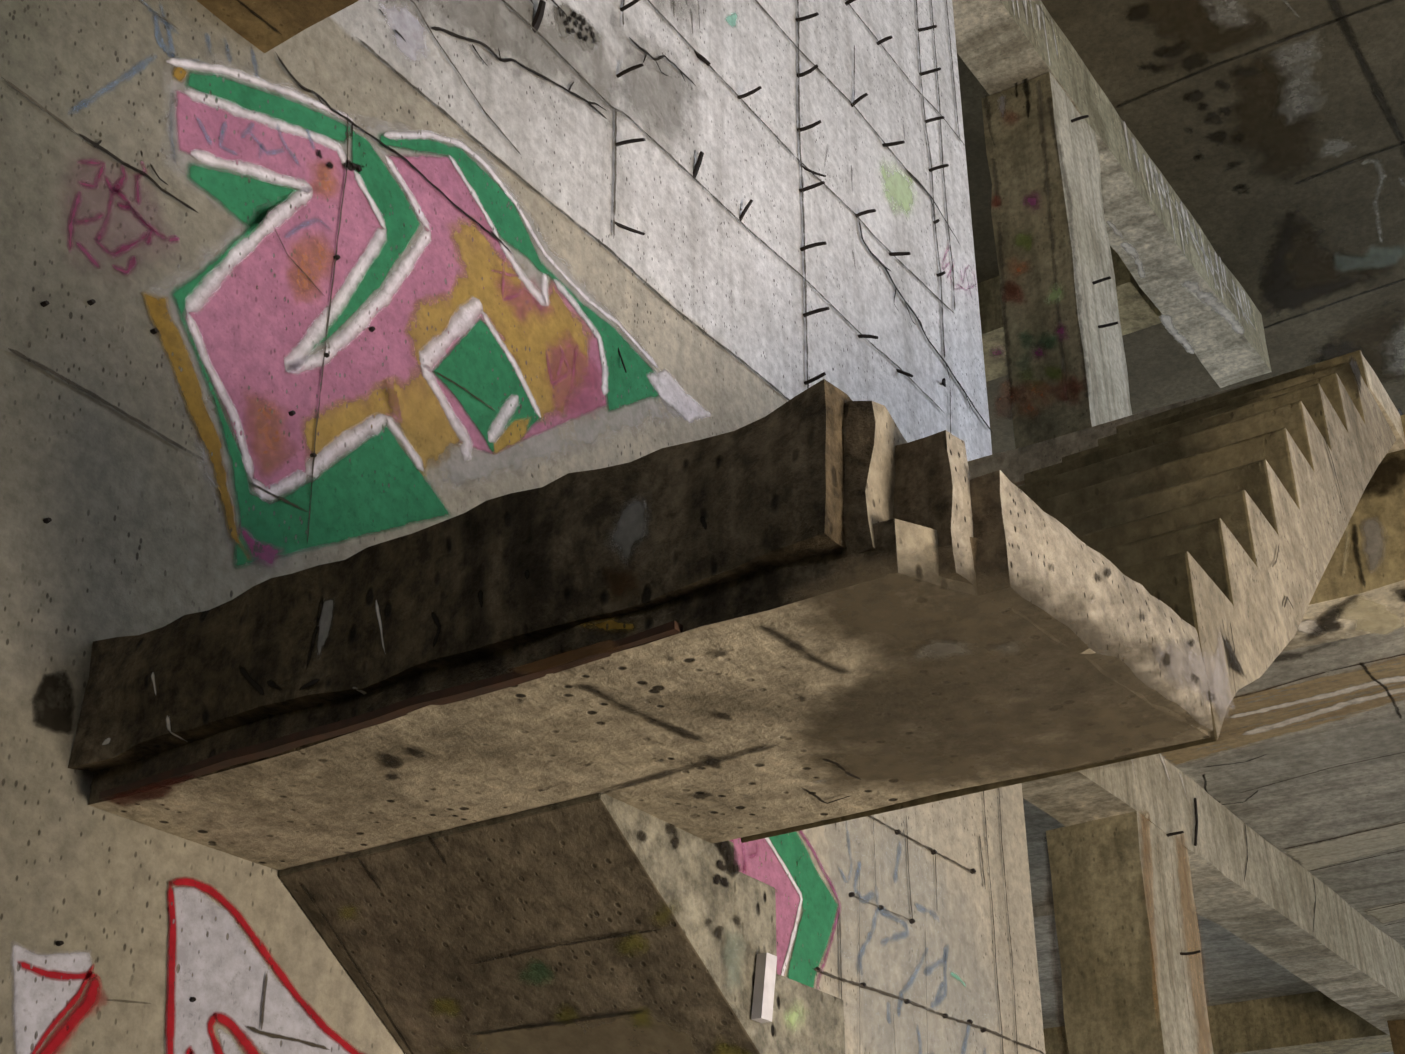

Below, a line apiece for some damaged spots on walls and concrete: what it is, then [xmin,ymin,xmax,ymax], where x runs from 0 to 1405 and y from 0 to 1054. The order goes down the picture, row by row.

crack [379,0,607,119]
crack [629,37,696,86]
crack [858,219,993,433]
water stain [985,96,1013,418]
water stain [1012,0,1405,400]
water stain [1363,453,1405,496]
water stain [1273,520,1405,662]